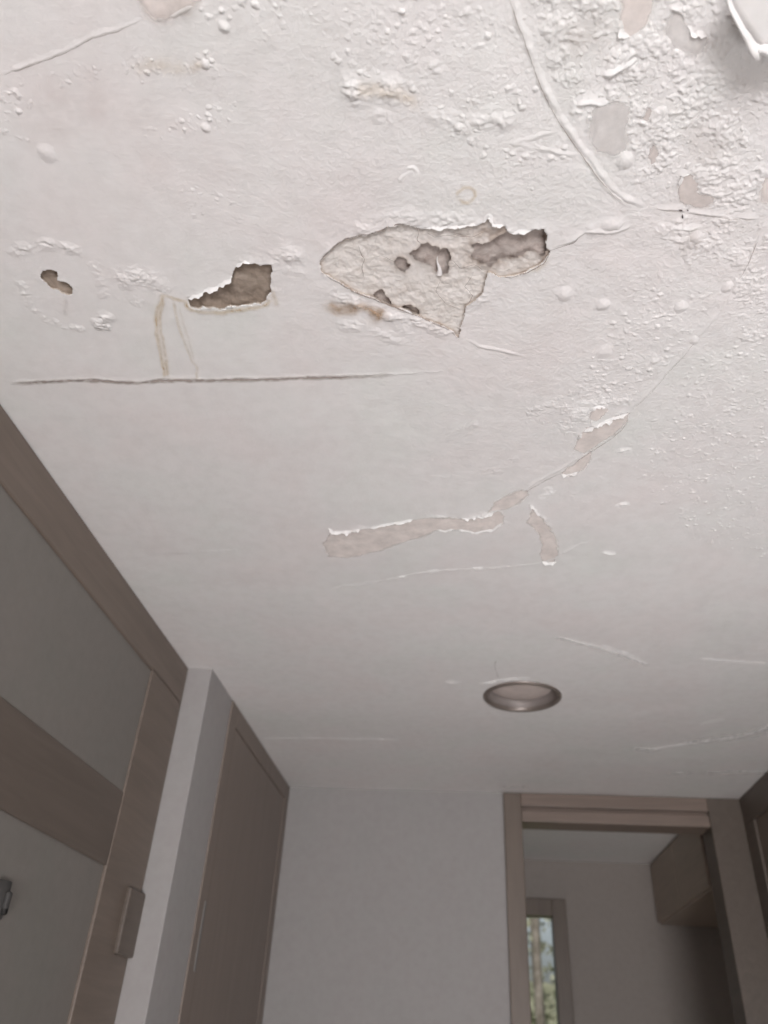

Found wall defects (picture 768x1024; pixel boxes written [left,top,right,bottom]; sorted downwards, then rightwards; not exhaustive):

crack [0,3,197,75]
peeling [528,0,768,343]
peeling [33,265,79,299]
peeling [180,253,282,315]
flaking render [313,210,558,342]
crack [11,368,446,384]
peeling [558,399,635,478]
peeling [323,486,562,566]